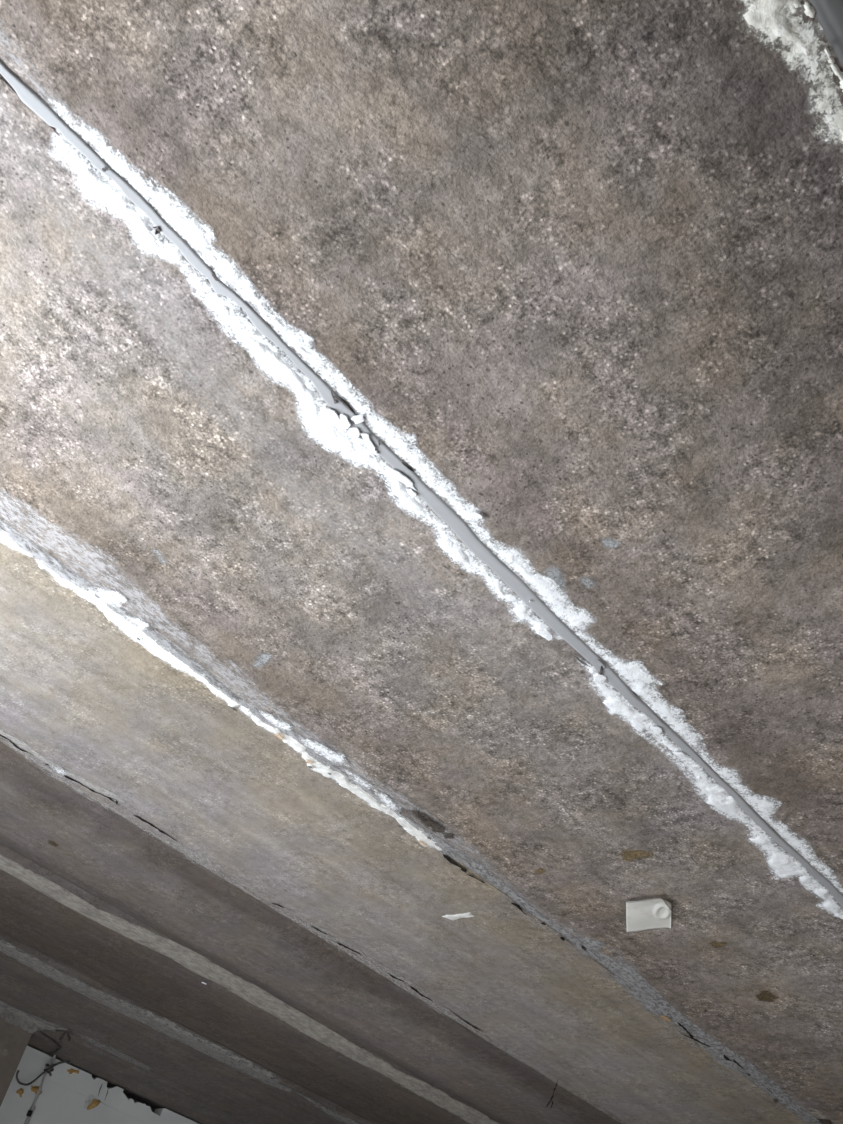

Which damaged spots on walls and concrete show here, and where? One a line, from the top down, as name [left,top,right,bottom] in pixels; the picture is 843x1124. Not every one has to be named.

water stain [741,0,843,144]
crack [331,391,356,415]
water stain [0,32,843,919]
crack [575,656,606,675]
crack [0,734,178,842]
crack [443,854,484,883]
crack [512,903,586,951]